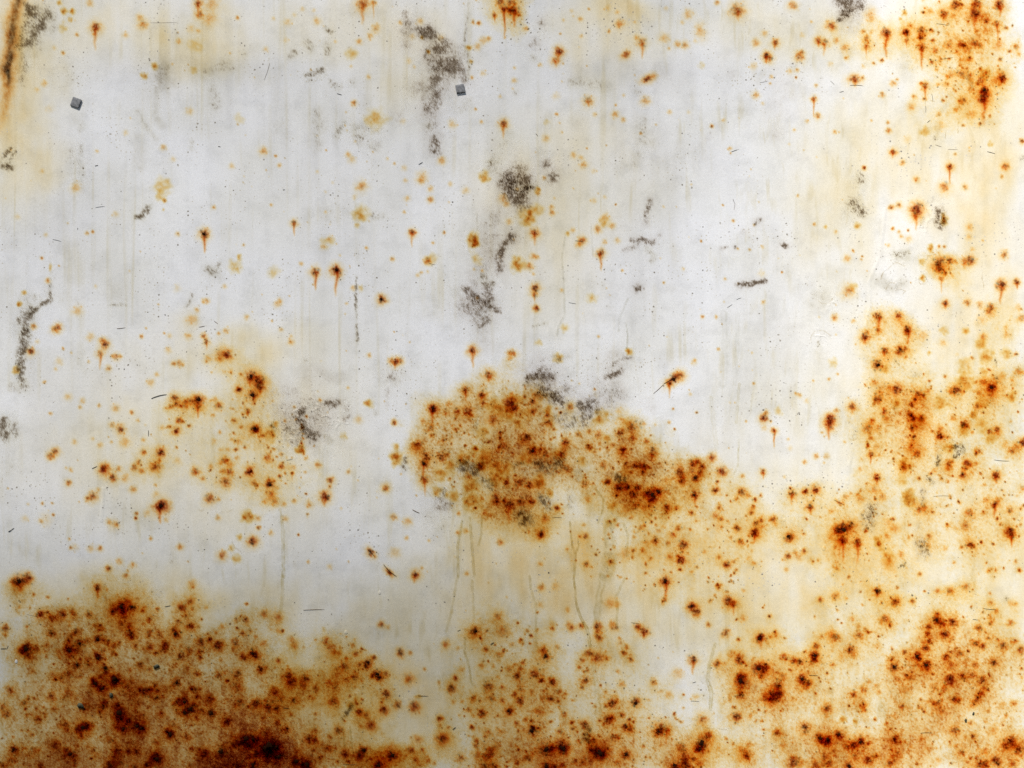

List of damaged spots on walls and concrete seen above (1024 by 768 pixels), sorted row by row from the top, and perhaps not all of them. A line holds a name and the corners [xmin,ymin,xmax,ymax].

leakage [405,17,465,113]
rust [941,0,1013,107]
leakage [497,165,535,220]
leakage [462,232,516,327]
leakage [17,292,51,382]
rust [429,393,595,514]
rust [677,456,775,543]
rust [0,587,423,768]
rust [460,651,639,768]
rust [733,655,783,721]
rust [802,690,931,768]
rust [890,613,1021,722]